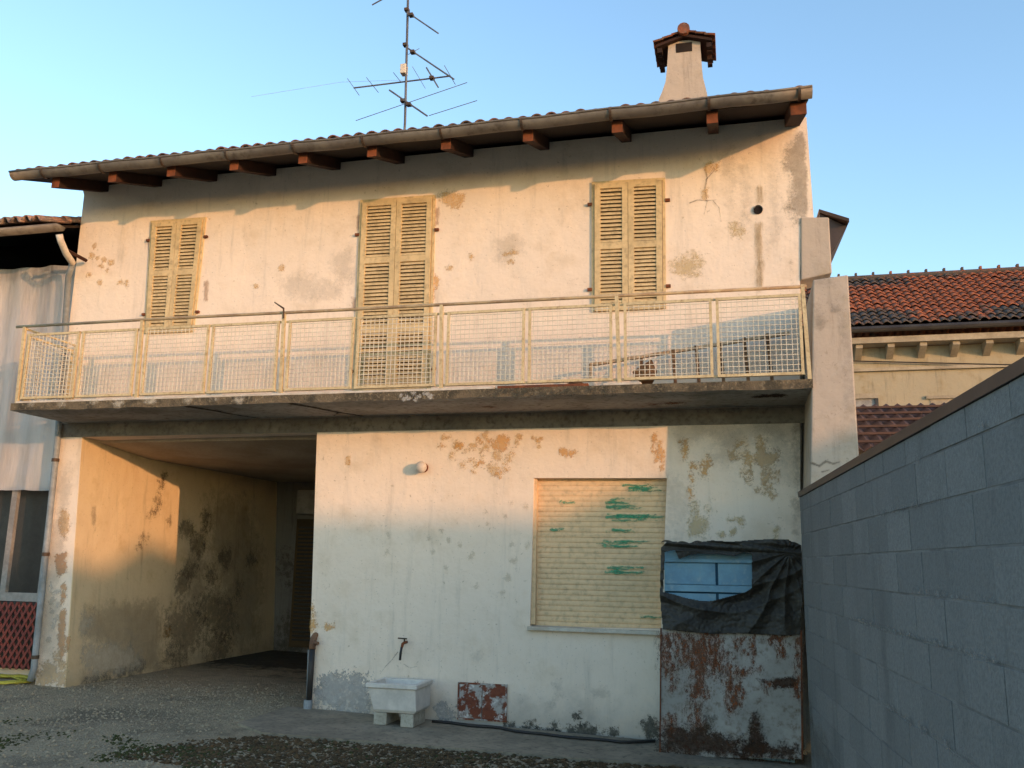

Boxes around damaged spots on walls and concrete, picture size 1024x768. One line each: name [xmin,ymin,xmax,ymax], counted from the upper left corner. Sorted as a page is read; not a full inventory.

flaking render [54,552,71,661]
corrosion [655,631,805,764]